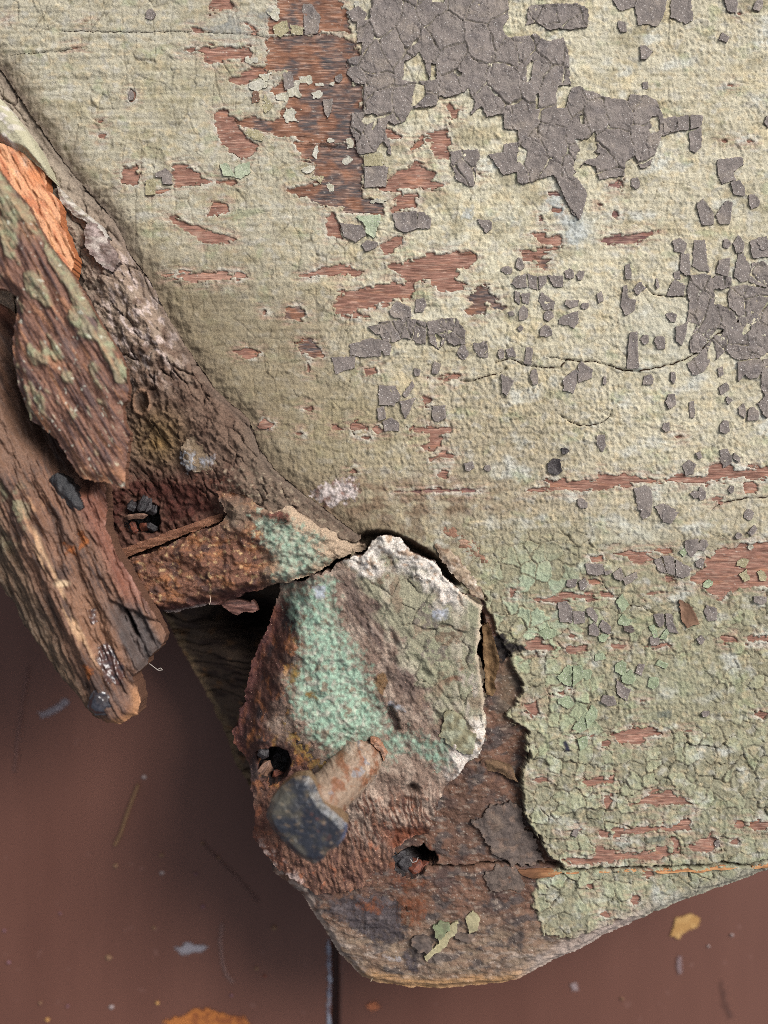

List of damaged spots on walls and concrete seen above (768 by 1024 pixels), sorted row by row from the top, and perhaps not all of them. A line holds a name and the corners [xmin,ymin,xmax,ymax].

peeling [723,0,763,15]
peeling [696,157,760,226]
peeling [121,0,703,494]
crack [470,320,739,382]
peeling [620,235,768,434]
peeling [527,447,768,524]
rust [112,478,367,613]
peeling [524,509,768,751]
peeling [583,775,614,809]
peeling [471,799,545,893]
peeling [562,818,768,879]
peeling [671,914,700,939]